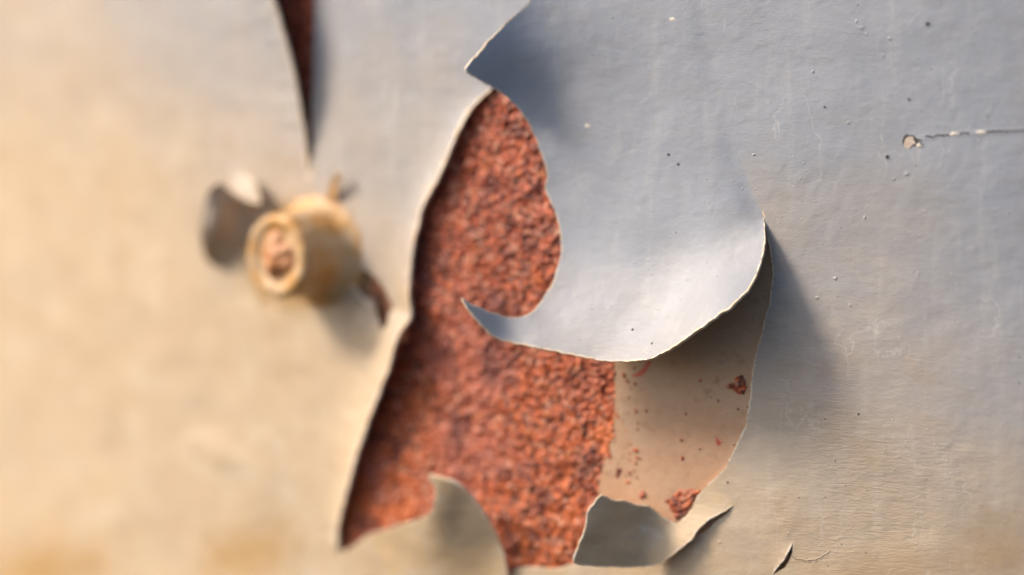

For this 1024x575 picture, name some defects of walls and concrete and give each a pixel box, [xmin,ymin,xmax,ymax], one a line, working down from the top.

rust [276,0,315,163]
crack [902,127,1024,148]
rust [339,88,648,575]
peeling [308,0,766,575]
rust [725,375,747,395]
rust [664,489,701,521]